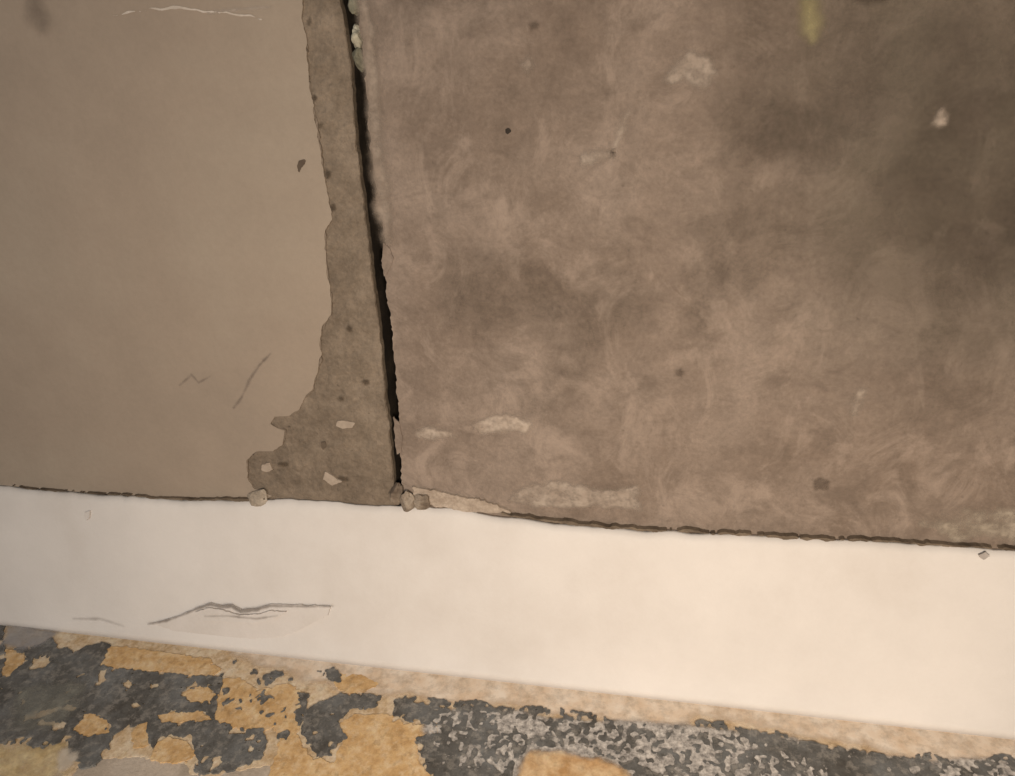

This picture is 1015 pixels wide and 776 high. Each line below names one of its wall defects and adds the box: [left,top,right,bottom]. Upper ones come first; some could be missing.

flaking render [246,0,395,505]
crack [343,0,403,505]
peeling [152,602,331,639]
peeling [0,625,1015,776]